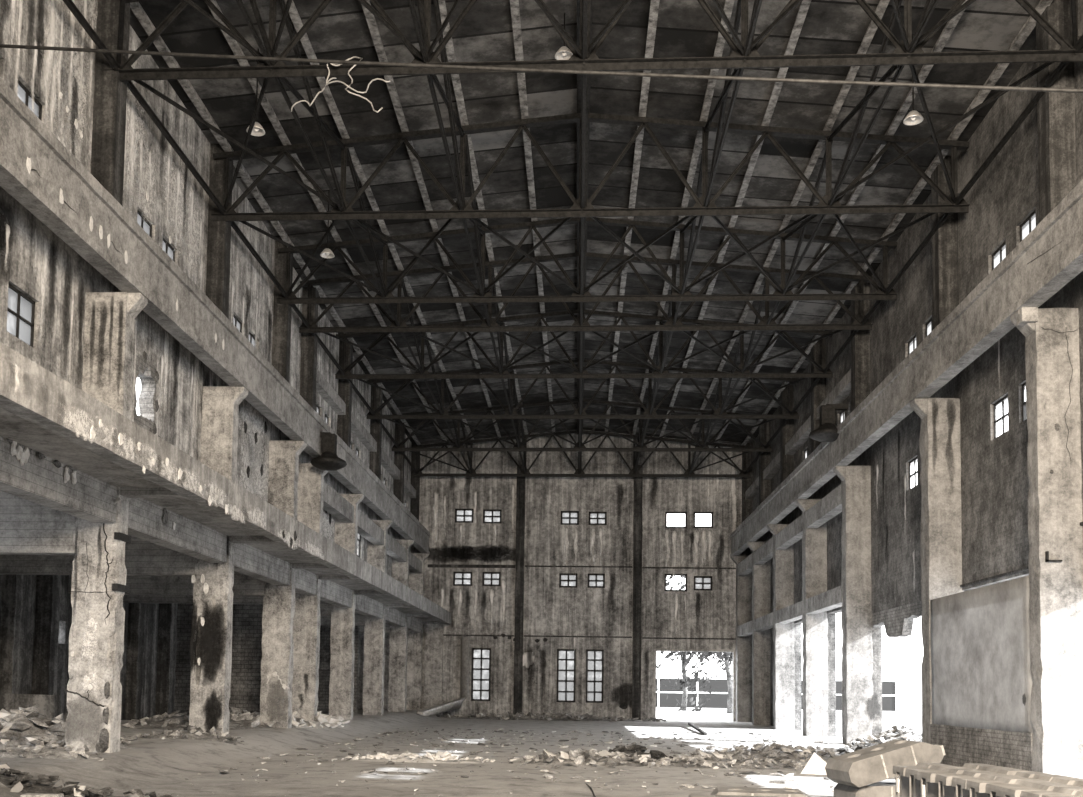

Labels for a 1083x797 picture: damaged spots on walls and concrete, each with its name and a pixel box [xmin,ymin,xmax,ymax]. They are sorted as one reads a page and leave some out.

spalling [191,574,209,594]
flaking render [66,618,110,753]